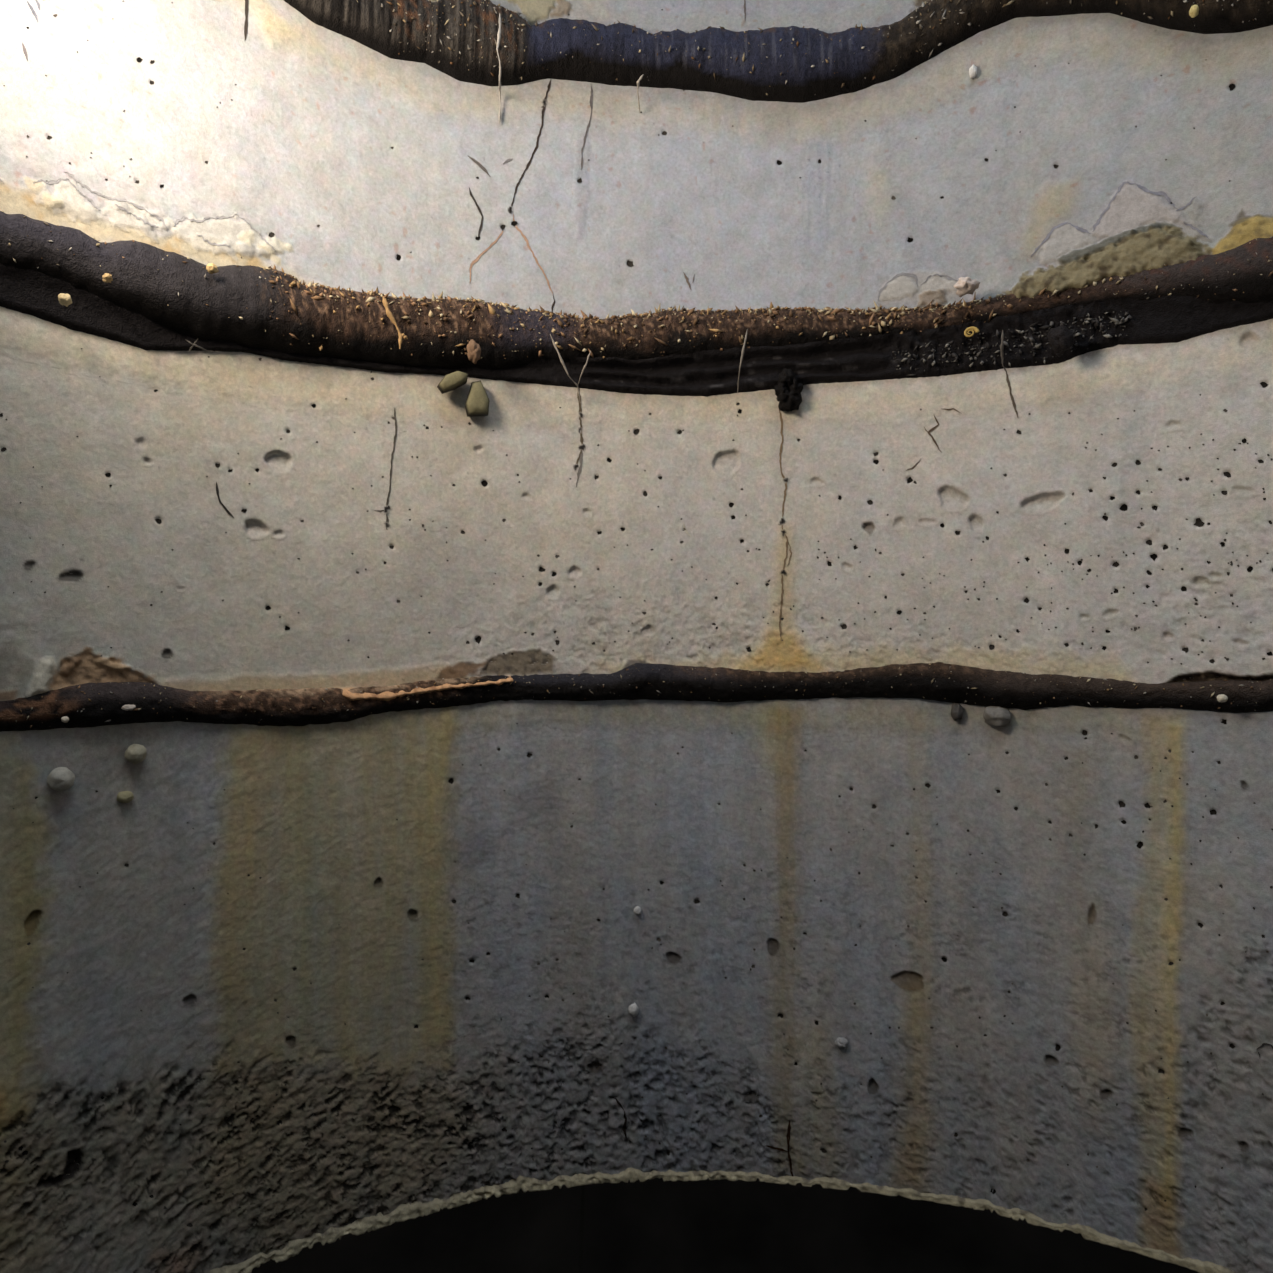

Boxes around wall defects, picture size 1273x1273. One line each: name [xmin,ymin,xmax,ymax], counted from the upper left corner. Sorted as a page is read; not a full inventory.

peeling [490,0,595,26]
crack [577,87,593,184]
peeling [0,135,344,290]
crack [469,80,555,311]
peeling [1029,176,1218,266]
peeling [873,267,962,309]
crack [572,388,586,487]
crack [777,410,792,637]
spalling [763,557,950,650]
damp [0,730,75,1273]
damp [183,697,1197,1264]